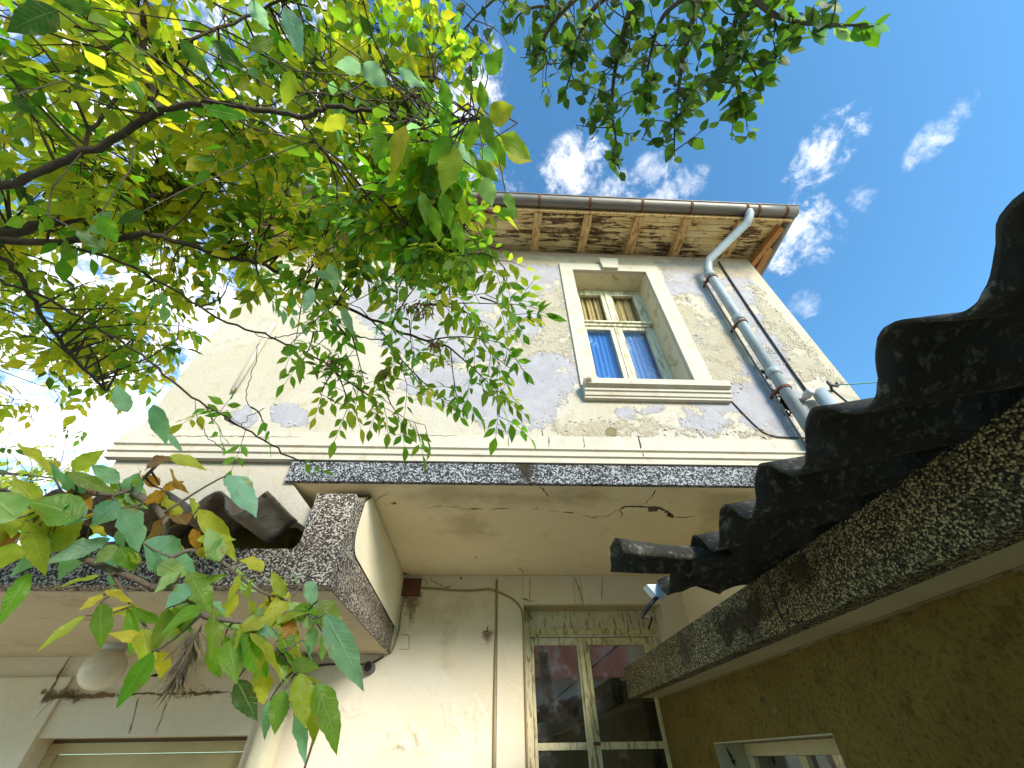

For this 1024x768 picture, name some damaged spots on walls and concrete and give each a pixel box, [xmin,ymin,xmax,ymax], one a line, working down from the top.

peeling [346,258,853,440]
peeling [227,402,309,430]
crack [540,487,692,519]
crack [37,656,232,732]